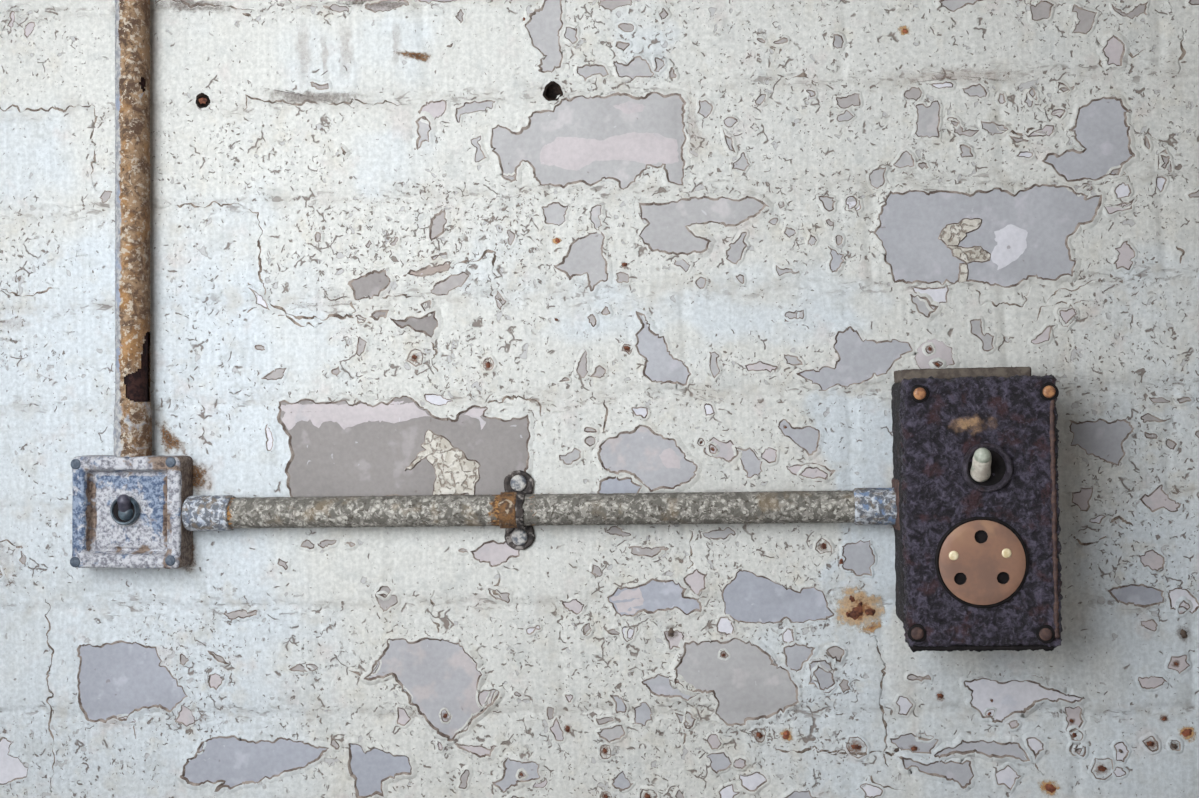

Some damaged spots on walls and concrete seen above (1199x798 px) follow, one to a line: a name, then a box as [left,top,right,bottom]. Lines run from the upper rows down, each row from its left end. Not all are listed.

peeling [411,0,1175,330]
peeling [742,321,915,396]
rust [161,426,211,491]
peeling [258,363,535,497]
peeling [556,400,841,494]
rust [836,587,885,633]
peeling [72,636,232,728]
peeling [175,731,418,798]
peeling [287,661,321,674]
peeling [359,632,550,798]
peeling [559,524,854,798]
peeling [887,670,1090,794]